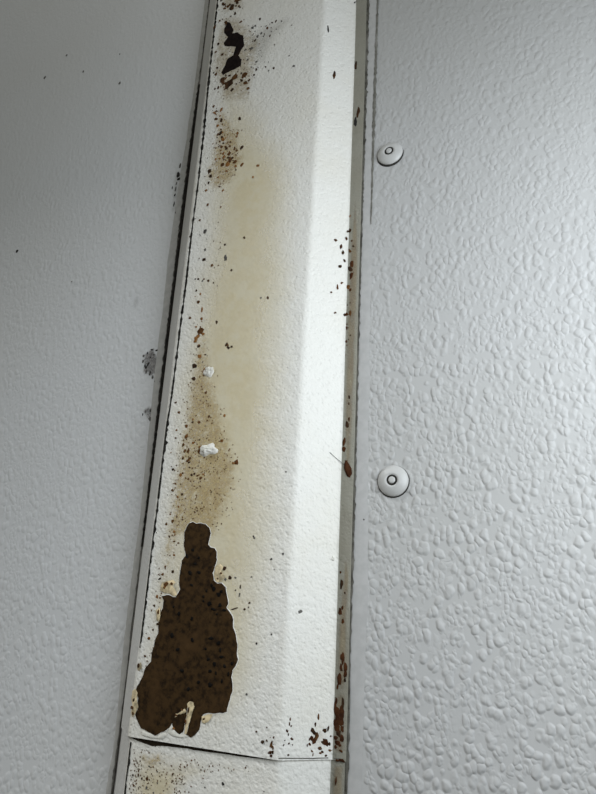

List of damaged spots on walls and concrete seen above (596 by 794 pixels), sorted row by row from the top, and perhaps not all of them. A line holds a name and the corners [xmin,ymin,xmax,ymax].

corrosion [204,0,260,192]
corrosion [330,228,354,293]
damp [198,158,265,608]
corrosion [333,417,352,478]
corrosion [307,652,347,763]